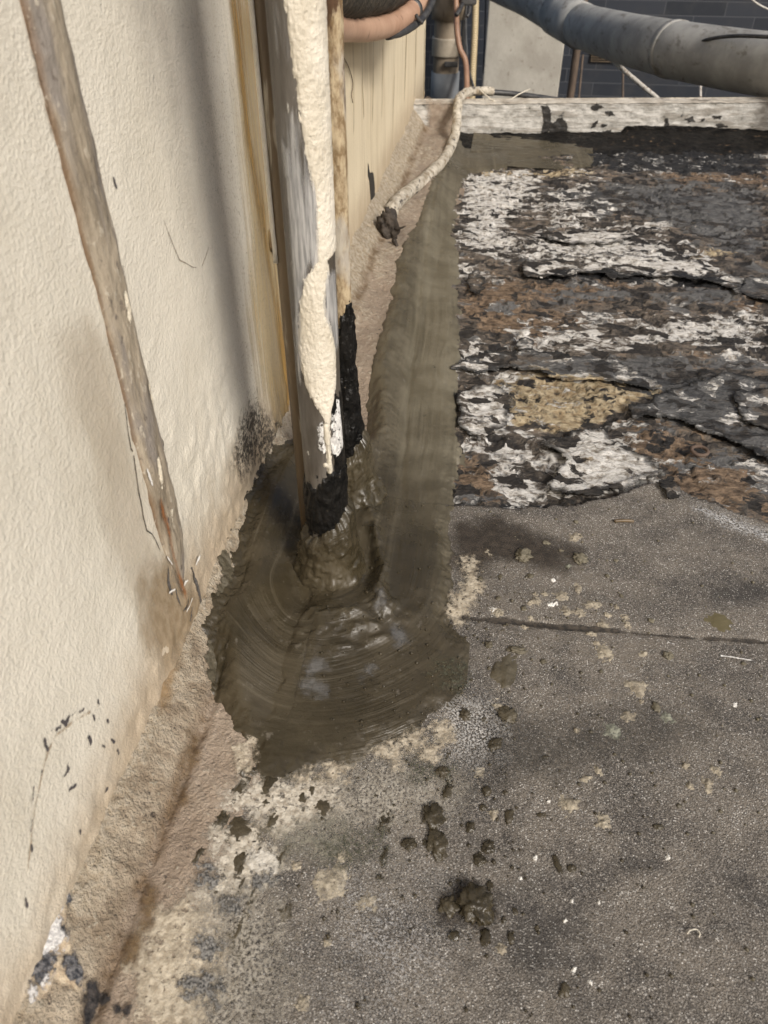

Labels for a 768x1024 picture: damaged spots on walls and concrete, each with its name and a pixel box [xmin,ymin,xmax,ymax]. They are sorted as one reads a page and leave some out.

damp [232,0,289,500]
damp [204,640,217,684]